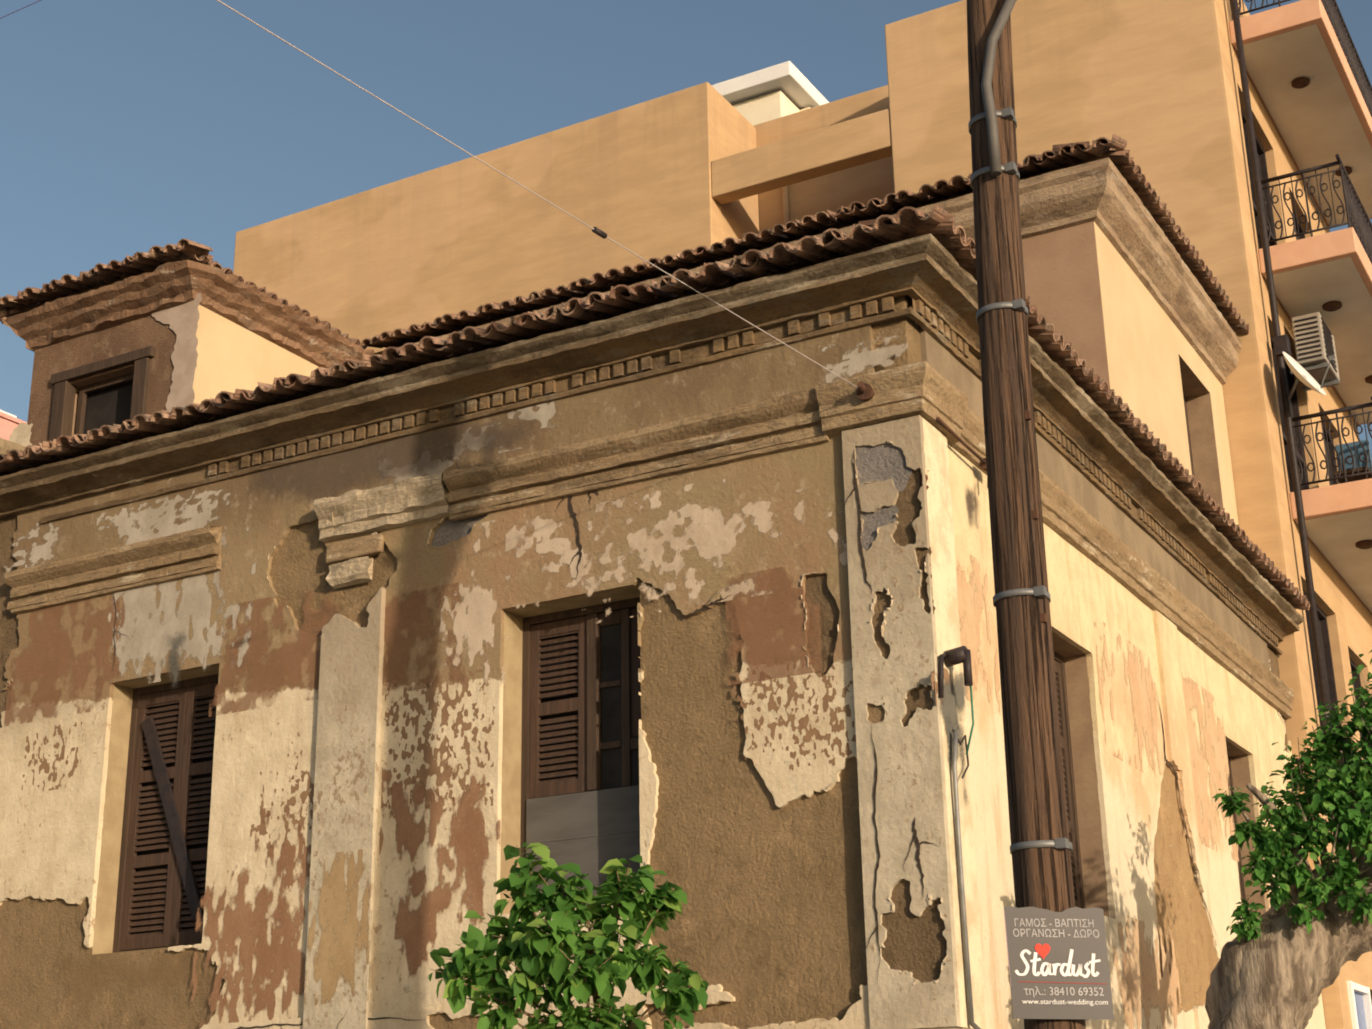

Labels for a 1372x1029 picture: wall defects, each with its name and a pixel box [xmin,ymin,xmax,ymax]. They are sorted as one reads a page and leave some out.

peeling [822,336,908,383]
crack [556,491,598,578]
crack [843,449,872,593]
spalling [828,441,929,566]
spalling [0,483,1000,1029]
crack [862,723,937,983]
spalling [1094,623,1239,1029]